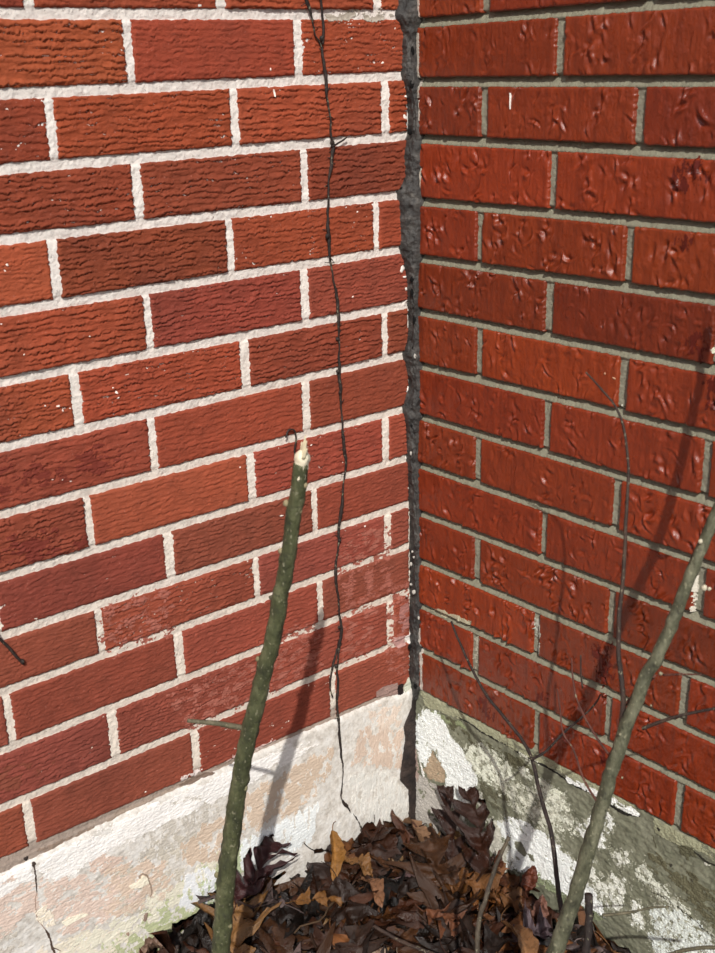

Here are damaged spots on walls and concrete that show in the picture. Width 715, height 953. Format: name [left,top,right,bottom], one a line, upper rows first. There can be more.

damp [446,716,539,778]
damp [479,781,522,820]
peeling [415,706,593,895]
damp [566,776,598,797]
damp [611,797,639,817]
peeling [581,812,715,953]
damp [641,852,715,929]